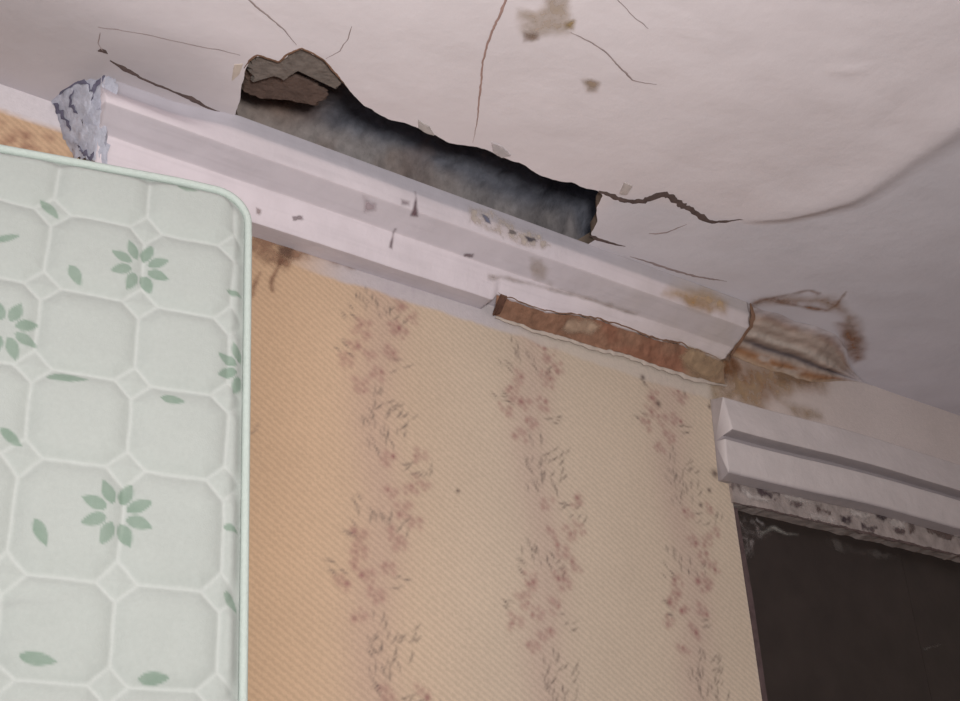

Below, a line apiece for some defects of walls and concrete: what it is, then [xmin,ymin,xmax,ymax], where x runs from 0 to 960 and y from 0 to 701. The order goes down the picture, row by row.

crack [98,27,239,112]
crack [249,0,296,44]
crack [473,0,507,140]
crack [570,32,657,85]
spalling [51,75,118,164]
spalling [232,63,598,247]
crack [599,191,742,234]
crack [630,256,727,282]
spalling [493,292,872,387]
leakage [722,358,810,405]